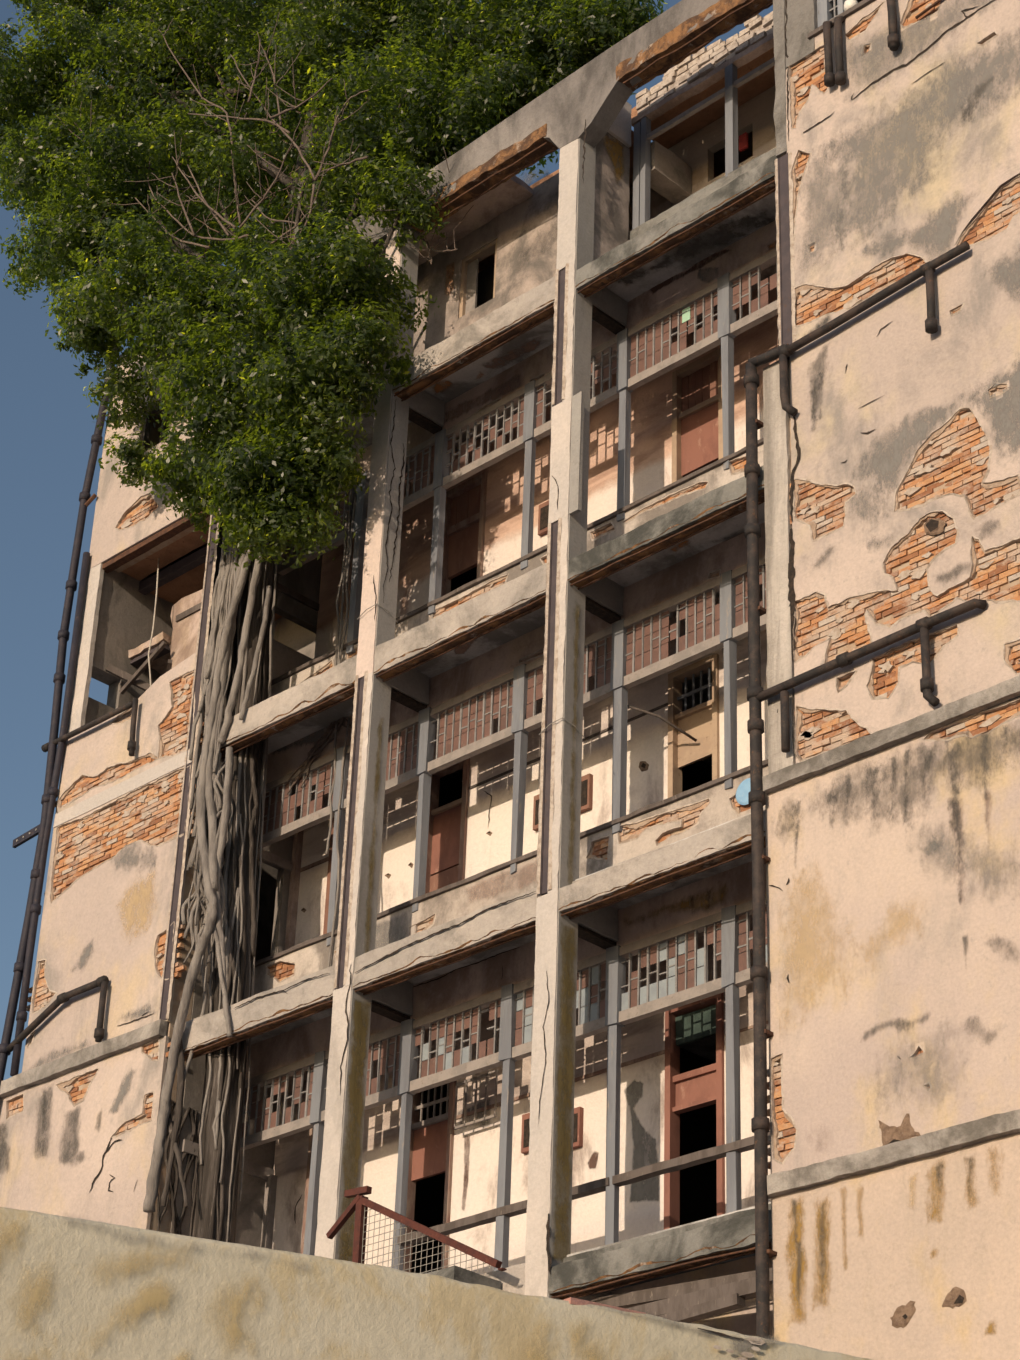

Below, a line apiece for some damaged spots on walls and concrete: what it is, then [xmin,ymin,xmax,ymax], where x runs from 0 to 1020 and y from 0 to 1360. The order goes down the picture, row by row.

spalling [955,175,1020,247]
spalling [392,150,927,421]
crack [373,401,405,620]
spalling [790,407,1020,762]
spalling [44,506,224,1020]
spalling [141,481,766,1061]
damp [829,733,1020,812]
damp [0,1127,8,1167]
damp [37,1092,52,1156]
damp [63,1109,83,1162]
crack [89,1138,137,1192]
spalling [942,1287,967,1309]